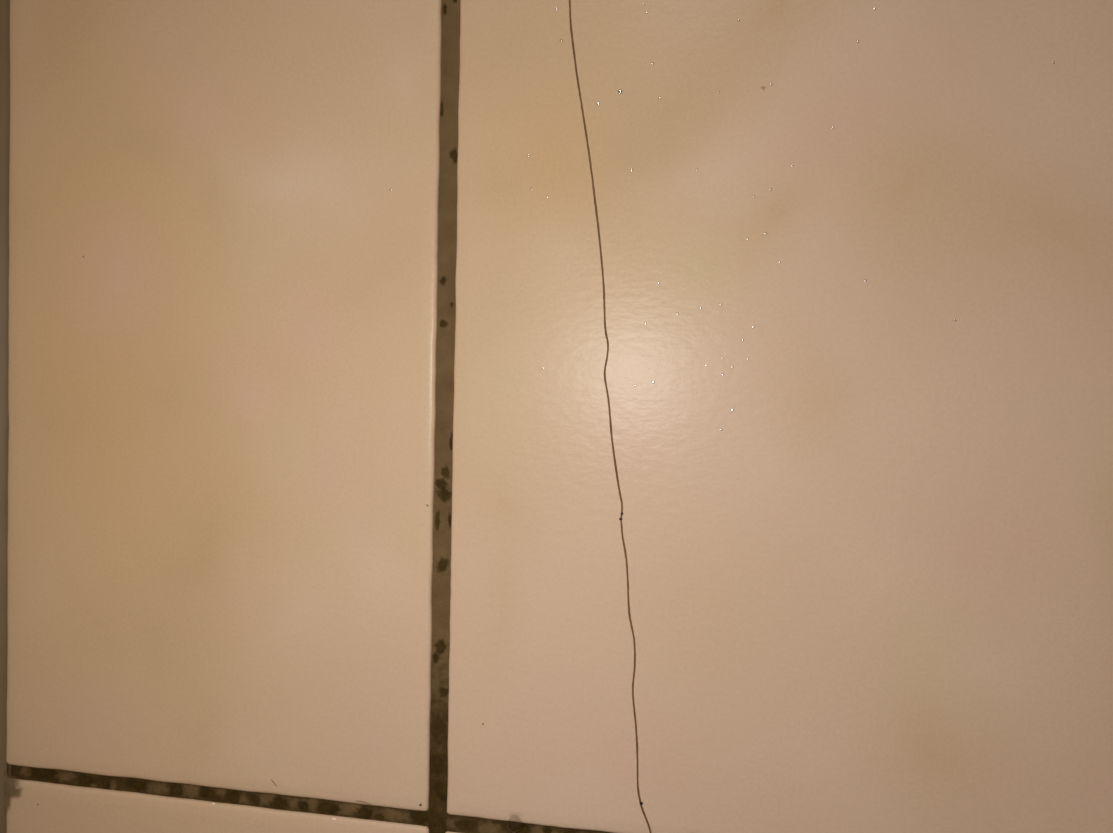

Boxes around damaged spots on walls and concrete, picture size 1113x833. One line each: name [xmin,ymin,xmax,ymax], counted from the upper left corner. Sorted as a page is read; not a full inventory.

crack [569,0,651,833]
damp [433,641,446,663]
damp [11,689,611,833]